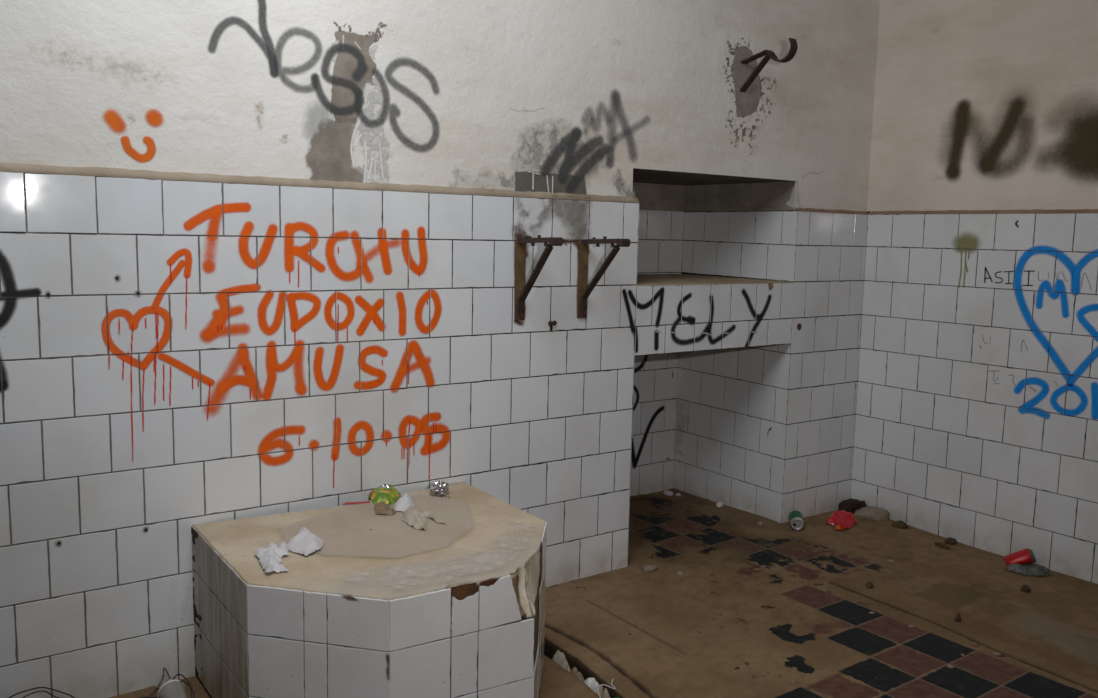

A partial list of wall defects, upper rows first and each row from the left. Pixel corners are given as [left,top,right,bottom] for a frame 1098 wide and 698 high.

flaking render [307,22,386,183]
flaking render [724,38,776,148]
corrosion [514,229,528,309]
corrosion [563,239,586,318]
spalling [451,544,543,672]